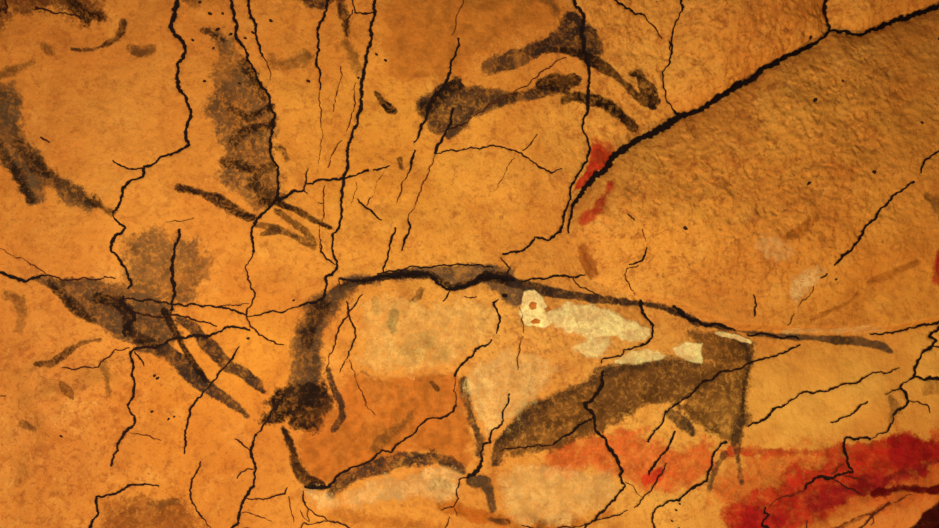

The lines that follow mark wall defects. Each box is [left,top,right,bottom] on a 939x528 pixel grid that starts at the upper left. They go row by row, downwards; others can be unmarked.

crack [35,6,81,19]
crack [0,249,116,283]
crack [88,483,159,528]
crack [183,346,239,528]
crack [62,0,390,467]
crack [231,293,508,528]
crack [338,0,939,301]
crack [442,151,939,528]